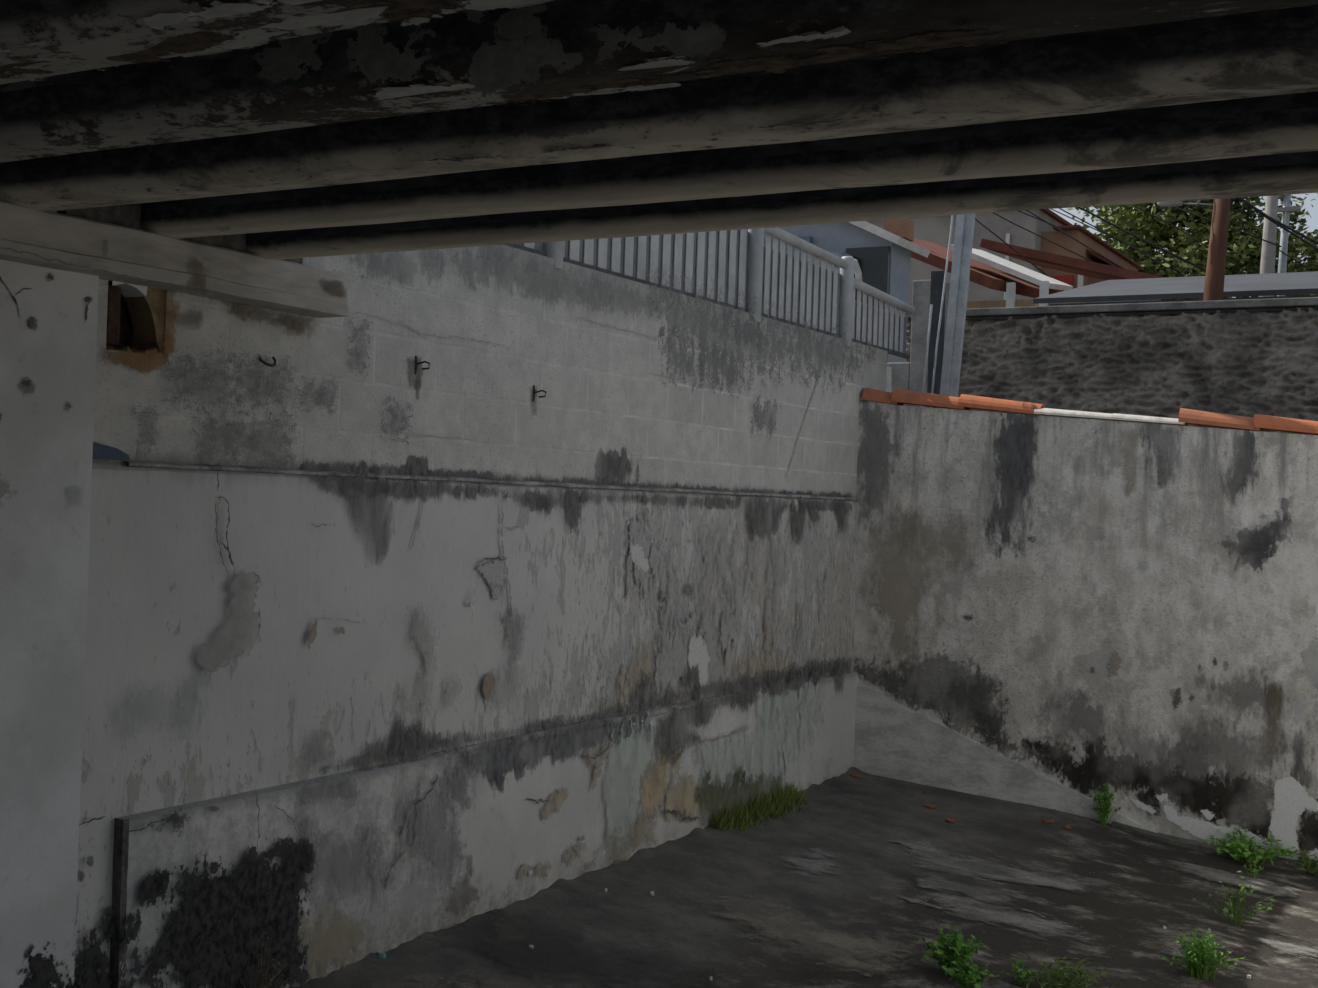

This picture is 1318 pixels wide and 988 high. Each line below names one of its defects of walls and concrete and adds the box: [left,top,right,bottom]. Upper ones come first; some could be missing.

peeling [0,0,727,103]
peeling [757,26,851,47]
crack [0,248,192,316]
crack [215,468,235,573]
leakage [134,351,899,557]
leakage [986,404,1038,557]
leakage [1225,516,1288,571]
peeling [602,510,740,857]
crack [384,774,439,889]
leakage [18,655,1283,988]
peeling [1130,777,1318,863]
leakage [1280,723,1318,859]